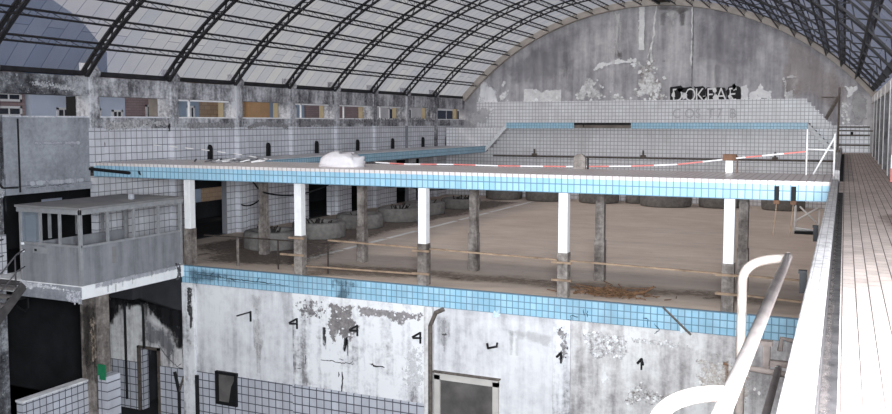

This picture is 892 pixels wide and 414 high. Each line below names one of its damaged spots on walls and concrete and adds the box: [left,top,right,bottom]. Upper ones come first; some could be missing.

peeling [575,7,667,101]
peeling [524,89,561,102]
peeling [741,84,772,99]
damp [430,201,515,220]
damp [198,239,294,264]
damp [307,229,356,259]
damp [368,222,418,237]
damp [190,270,219,281]
damp [80,305,97,368]
damp [142,300,182,357]
peeling [295,299,423,342]
peeling [583,325,691,360]